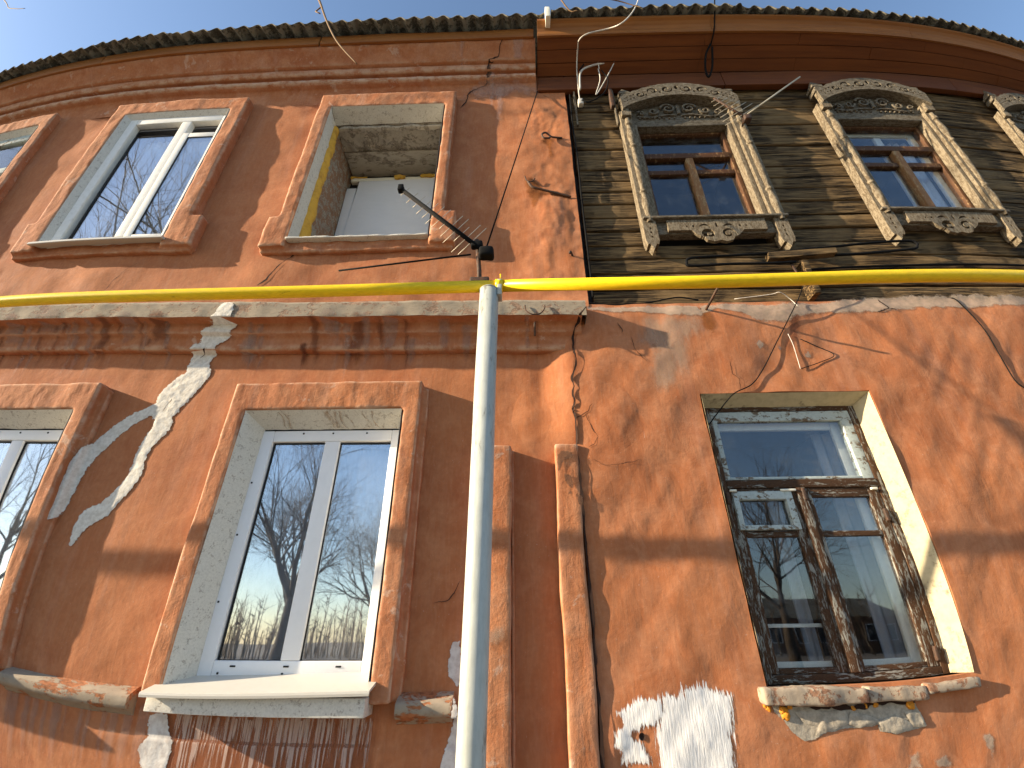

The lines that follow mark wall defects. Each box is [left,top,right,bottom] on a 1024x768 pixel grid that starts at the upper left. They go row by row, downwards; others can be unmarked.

crack [461,40,502,107]
crack [571,306,639,768]
damp [175,714,371,768]
flaking render [772,701,927,741]